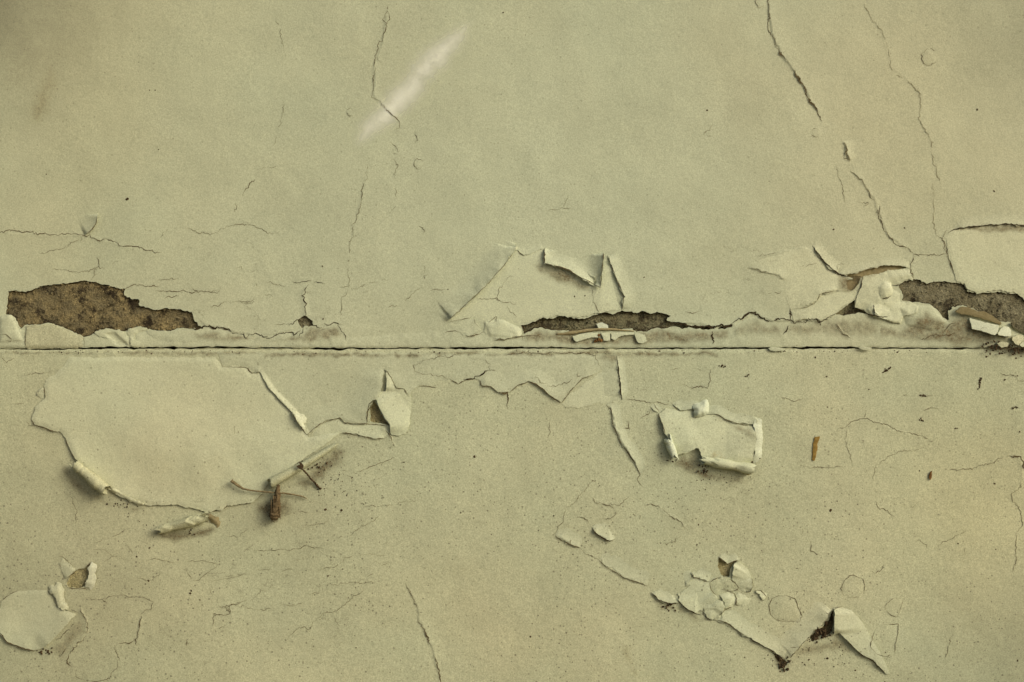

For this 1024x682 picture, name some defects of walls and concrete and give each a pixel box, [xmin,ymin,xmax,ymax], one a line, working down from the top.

crack [767,0,822,121]
crack [1,104,285,278]
crack [836,4,953,277]
crack [124,263,383,339]
peeling [759,212,1024,348]
peeling [0,240,732,534]
crack [413,351,600,408]
peeling [641,399,763,475]
peeling [0,558,97,651]
crack [405,583,441,682]
peeling [556,523,890,674]